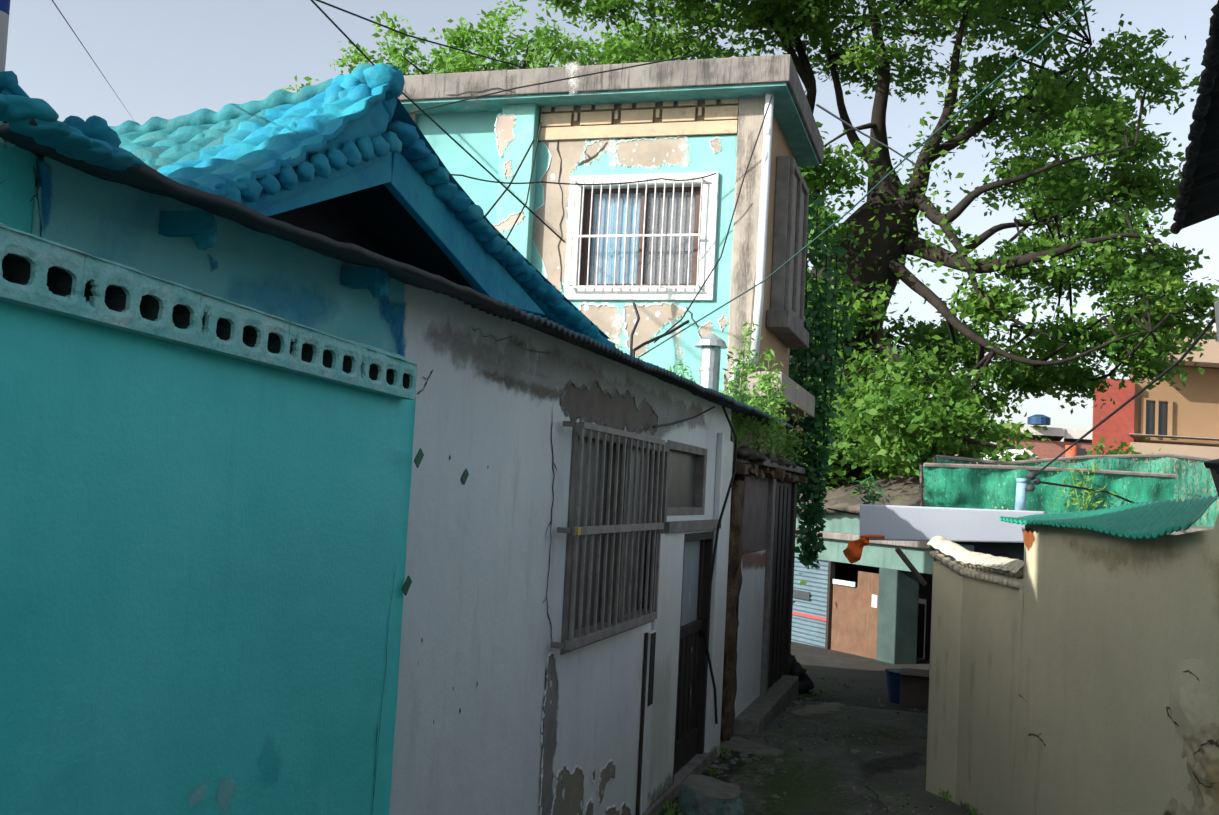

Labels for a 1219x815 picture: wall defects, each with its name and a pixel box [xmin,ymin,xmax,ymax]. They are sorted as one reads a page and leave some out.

peeling [494,113,517,179]
peeling [709,136,722,156]
crack [1,165,42,237]
peeling [492,136,689,292]
peeling [578,300,687,359]
peeling [697,314,729,339]
damp [429,328,704,439]
spalling [560,379,658,436]
crack [539,411,558,804]
peeling [538,651,632,815]